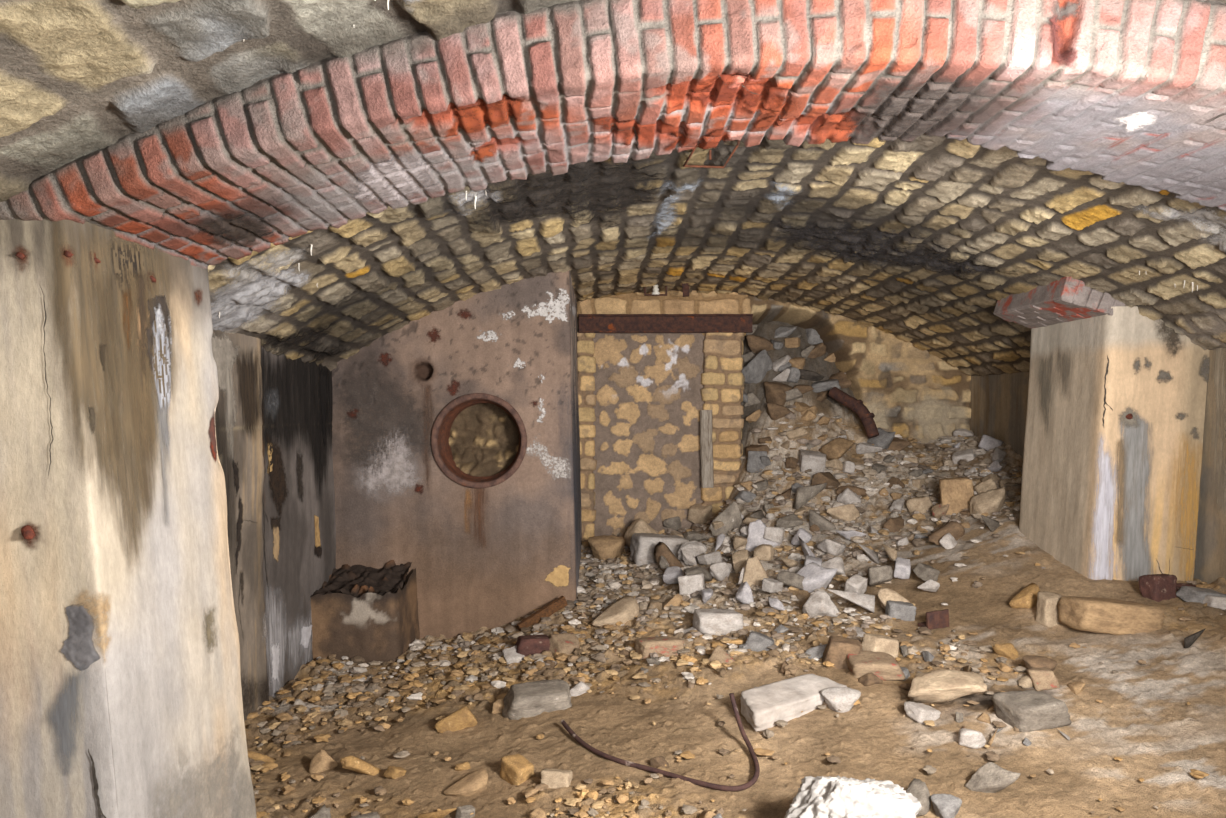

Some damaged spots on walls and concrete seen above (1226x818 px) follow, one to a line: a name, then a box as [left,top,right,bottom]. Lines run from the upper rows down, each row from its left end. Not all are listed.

spalling [1050,1,1080,66]
spalling [666,126,732,151]
spalling [692,73,798,131]
spalling [816,112,857,144]
damp [211,249,309,332]
damp [54,224,174,552]
damp [215,407,244,603]
damp [237,353,303,519]
damp [361,436,417,492]
spalling [48,591,110,773]
damp [241,589,312,714]
crack [88,749,106,818]